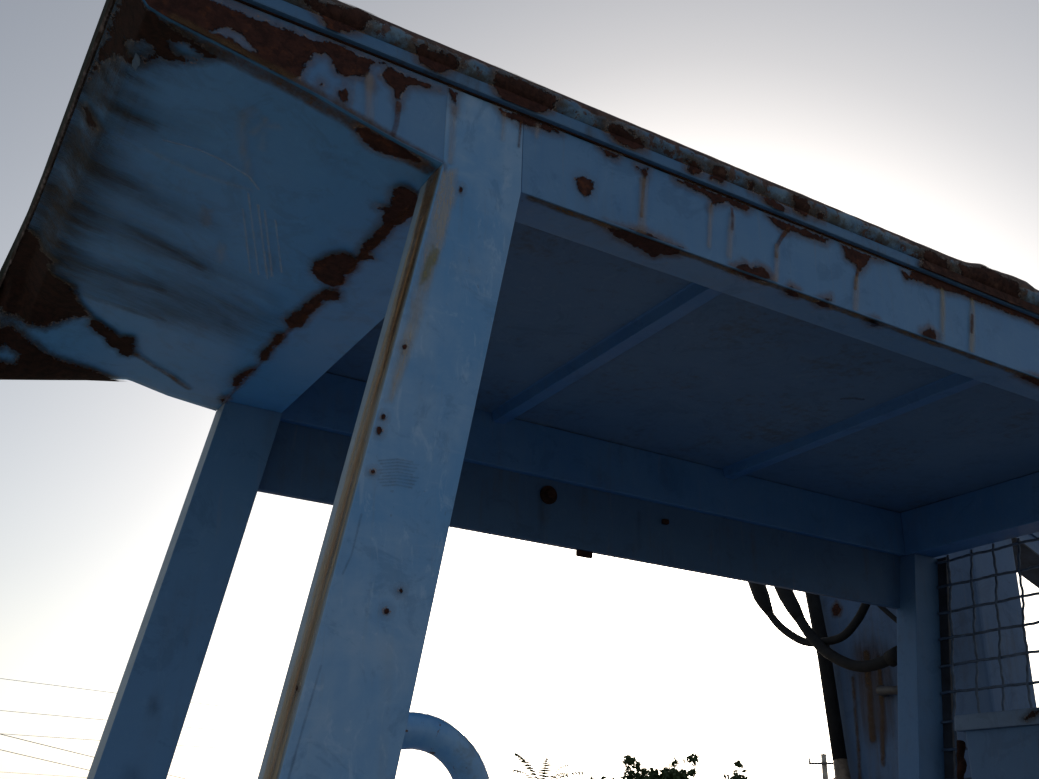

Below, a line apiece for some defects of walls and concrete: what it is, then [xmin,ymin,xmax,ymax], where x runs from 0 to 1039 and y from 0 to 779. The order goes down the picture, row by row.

corrosion [490,68,563,147]
corrosion [600,118,649,159]
corrosion [574,176,594,196]
corrosion [677,159,751,230]
corrosion [747,179,829,258]
corrosion [0,228,190,390]
corrosion [528,196,1039,387]
corrosion [88,0,465,779]
corrosion [852,650,886,779]